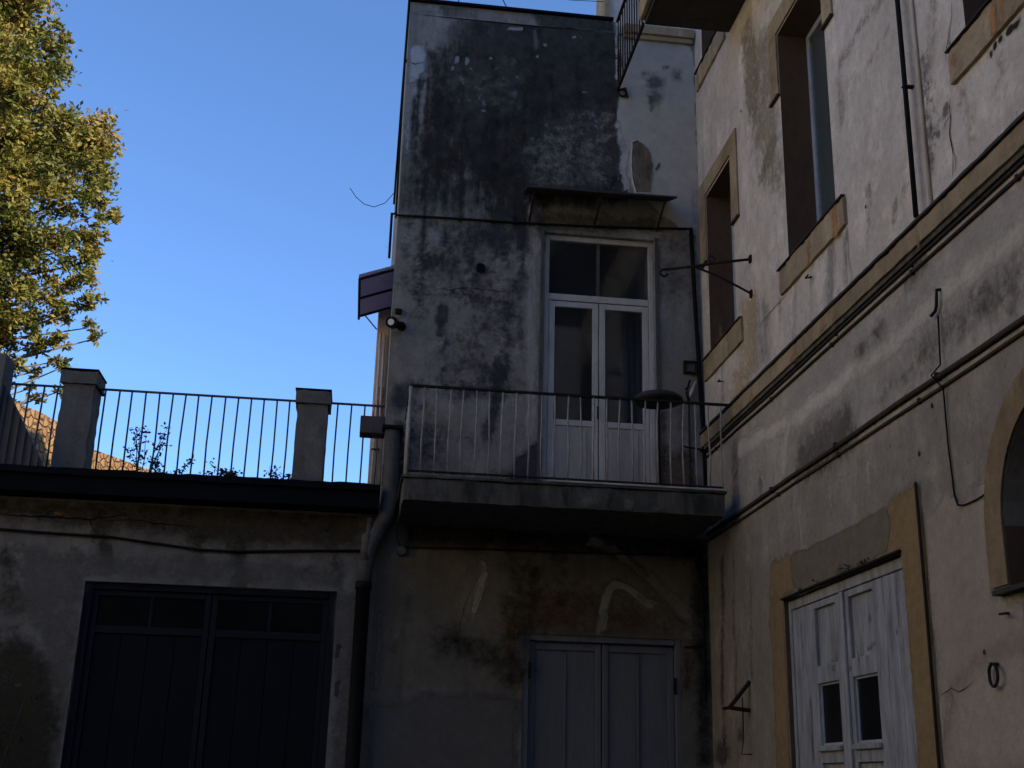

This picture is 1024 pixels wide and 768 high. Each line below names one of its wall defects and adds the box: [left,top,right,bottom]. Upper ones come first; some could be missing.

flaking render [615,122,660,194]
water stain [741,19,780,187]
water stain [401,13,657,482]
water stain [398,423,439,492]